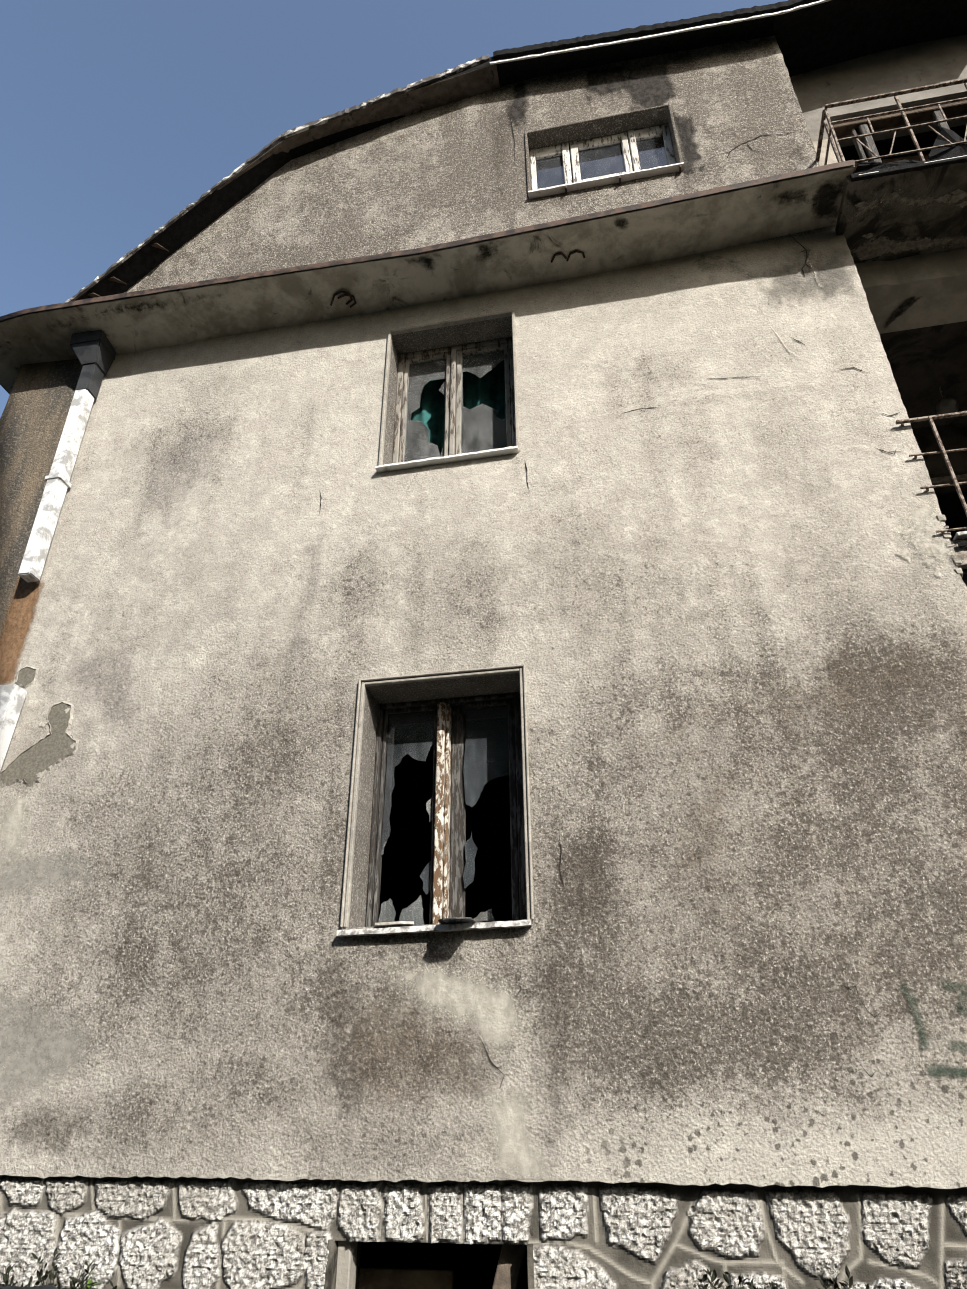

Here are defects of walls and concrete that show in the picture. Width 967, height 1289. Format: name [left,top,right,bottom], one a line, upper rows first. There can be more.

water stain [778,183,842,219]
flaking render [0,701,79,849]
crack [476,1032,505,1089]